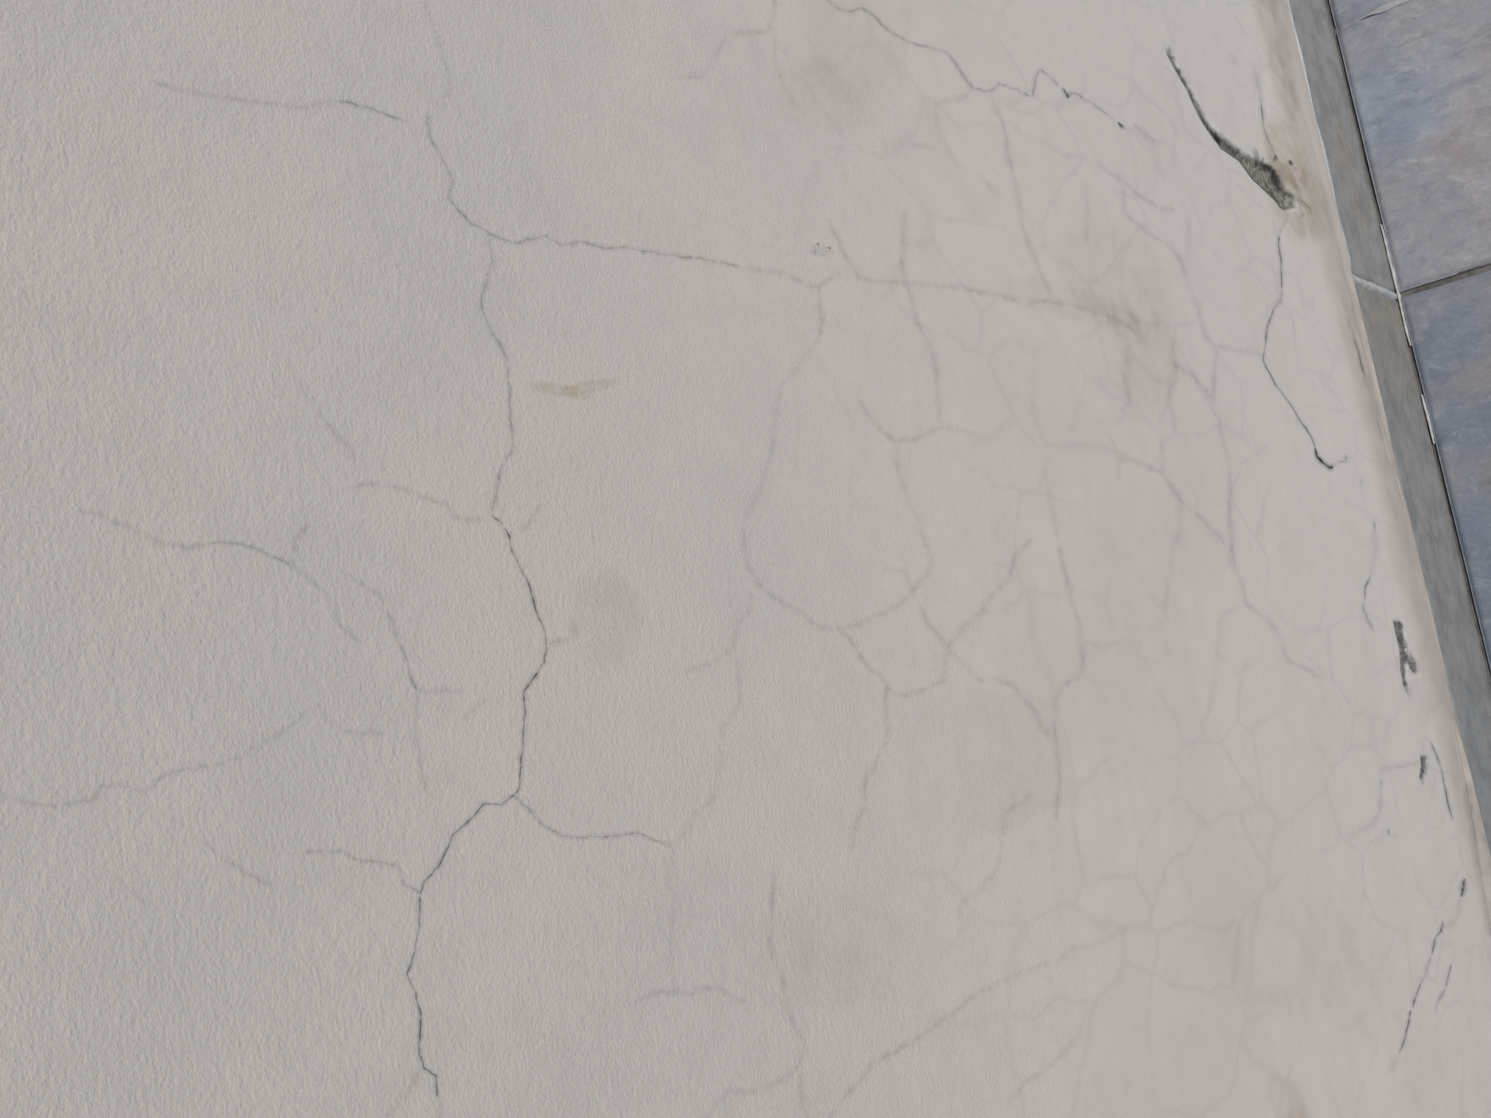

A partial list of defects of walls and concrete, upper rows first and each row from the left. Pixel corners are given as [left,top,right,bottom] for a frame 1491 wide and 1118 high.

flaking render [1168,56,1307,209]
flaking render [1390,619,1416,686]